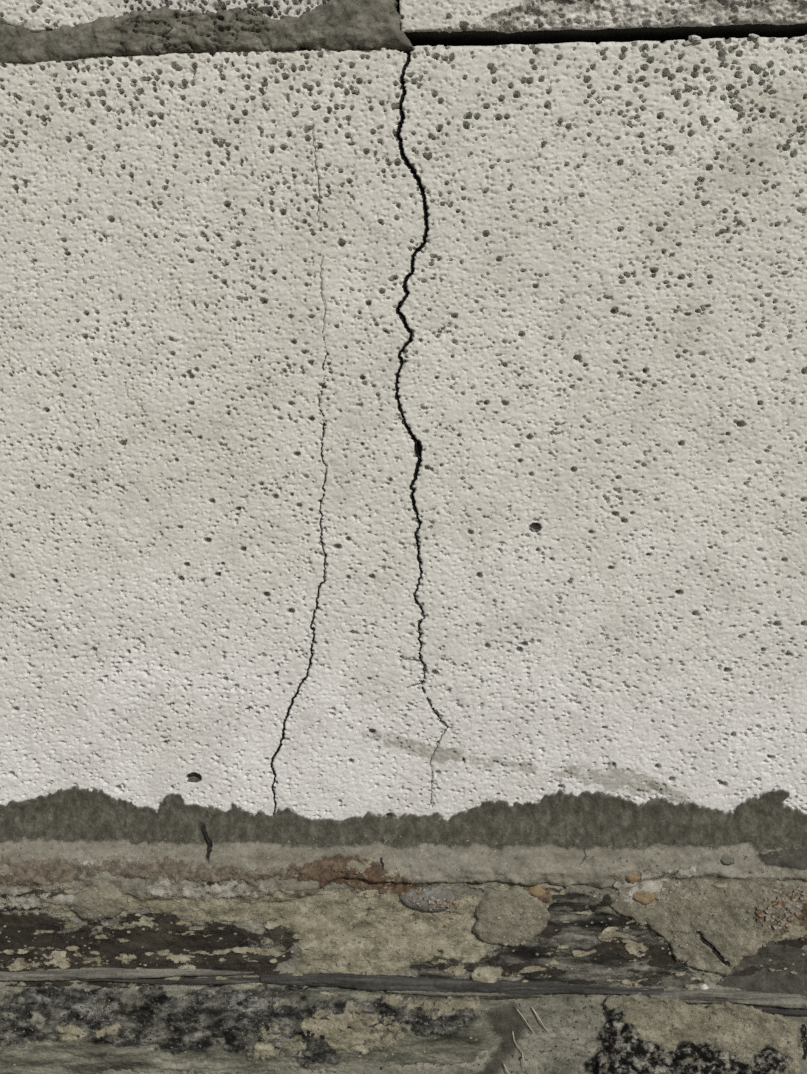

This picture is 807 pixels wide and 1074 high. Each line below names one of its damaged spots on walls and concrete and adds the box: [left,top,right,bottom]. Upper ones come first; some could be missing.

crack [312,132,320,222]
crack [395,51,448,806]
crack [271,257,328,816]
damp [0,786,807,870]
damp [0,855,300,917]
damp [116,913,281,975]
corrosion [288,853,422,896]
damp [498,964,598,986]
damp [546,866,699,913]
damp [571,916,678,978]
damp [718,934,807,996]
corrosion [780,896,807,940]